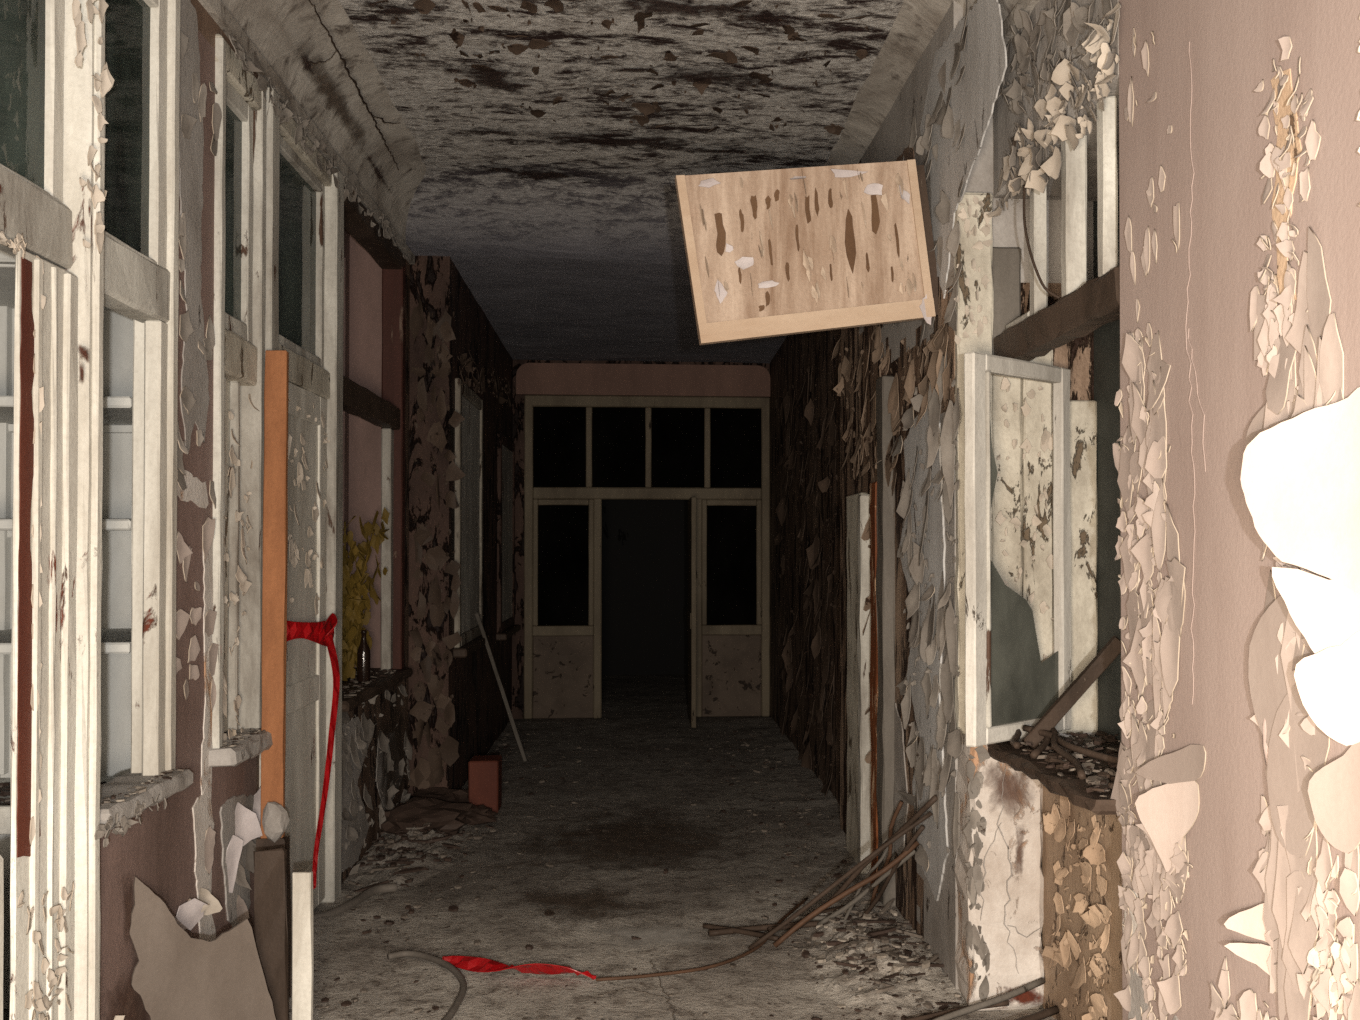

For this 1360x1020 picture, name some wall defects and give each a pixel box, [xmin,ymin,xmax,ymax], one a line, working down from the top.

damp [302,56,364,139]
damp [445,68,530,92]
peeling [449,0,564,93]
peeling [520,51,722,133]
damp [551,0,786,21]
damp [616,68,810,91]
damp [486,168,600,184]
damp [463,130,746,154]
peeling [175,0,263,941]
flaking render [774,0,1157,1001]
peeling [1210,36,1360,1020]
peeling [341,295,516,875]